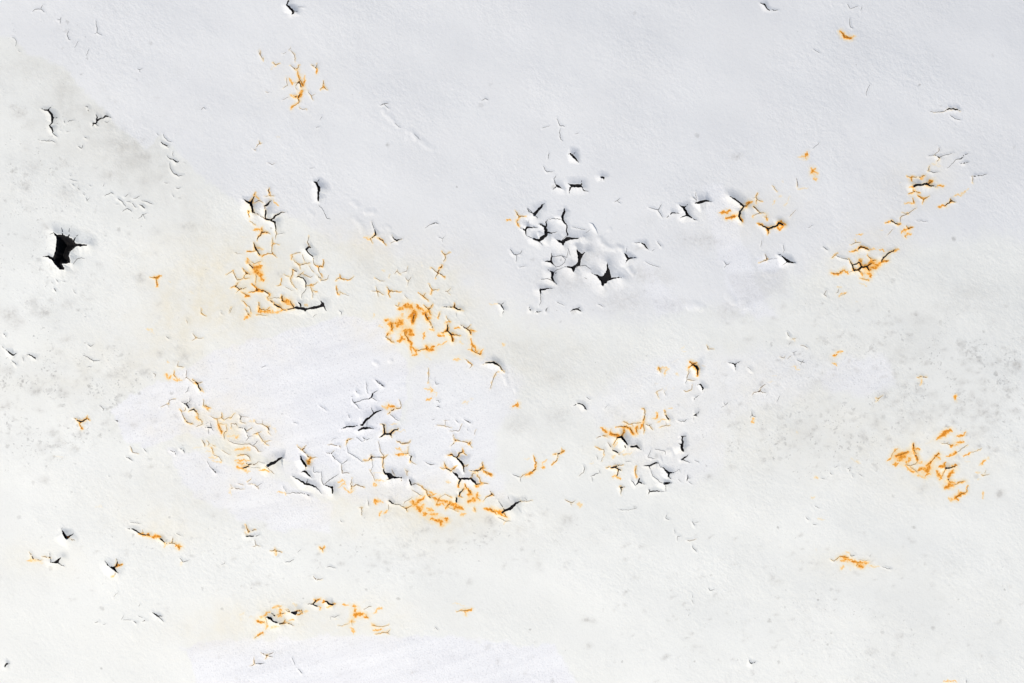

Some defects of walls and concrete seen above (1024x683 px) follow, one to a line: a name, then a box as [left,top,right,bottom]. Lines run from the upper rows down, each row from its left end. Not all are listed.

peeling [40,220,100,281]
crack [540,116,715,269]
crack [722,145,990,305]
rust [369,293,443,361]
crack [311,219,610,525]
rust [462,335,488,364]
crack [70,404,287,498]
crack [482,330,811,554]
rust [882,421,993,507]
crack [240,520,404,638]
rust [337,598,386,625]
rust [814,546,894,576]